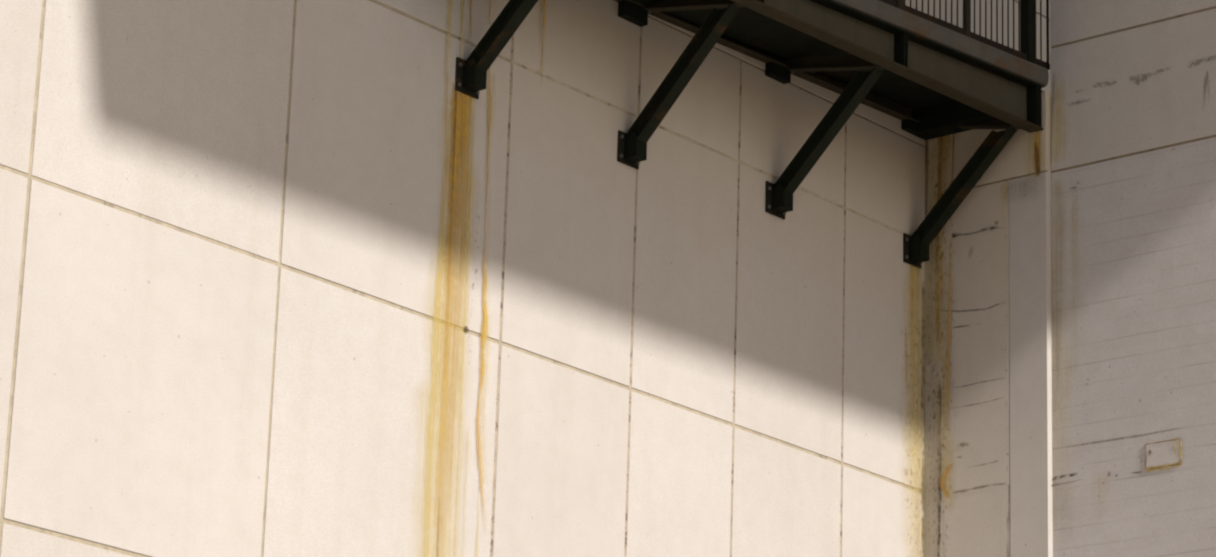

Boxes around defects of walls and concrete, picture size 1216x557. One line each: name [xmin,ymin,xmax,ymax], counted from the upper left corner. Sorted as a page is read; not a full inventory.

rust [440,90,487,478]
leakage [905,231,951,555]